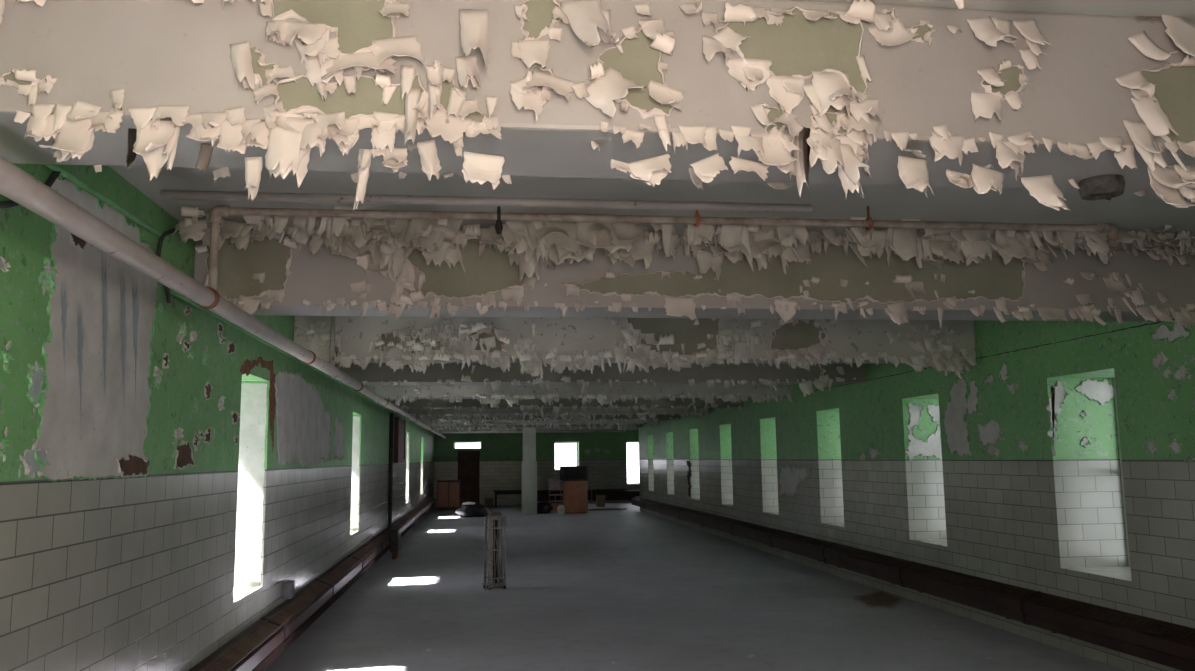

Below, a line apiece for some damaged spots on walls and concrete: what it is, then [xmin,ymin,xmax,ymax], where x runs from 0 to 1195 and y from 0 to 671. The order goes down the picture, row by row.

water stain [103,277,138,374]
corrosion [240,357,276,453]
peeling [193,371,360,583]
peeling [0,0,1195,500]